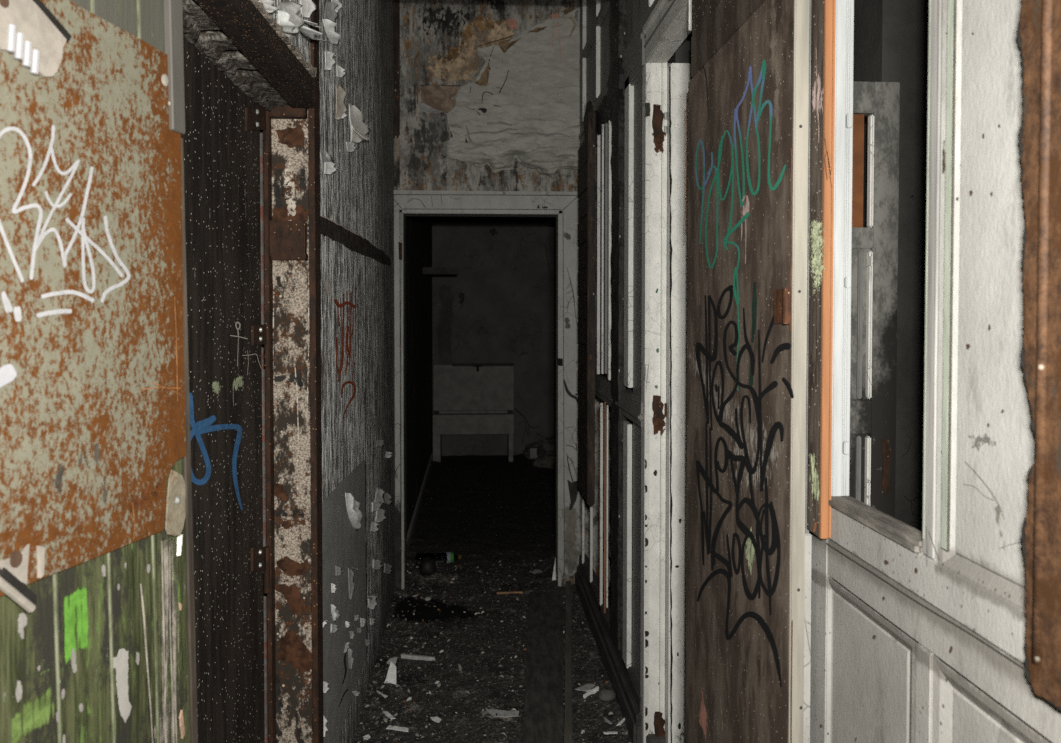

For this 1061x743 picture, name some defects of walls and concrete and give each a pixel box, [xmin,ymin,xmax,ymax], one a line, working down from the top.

peeling [477,26,547,53]
peeling [251,0,371,152]
rust [276,125,306,148]
peeling [320,152,337,174]
rust [652,132,666,153]
rust [272,205,308,221]
rust [652,415,666,435]
peeling [345,488,393,532]
rust [275,557,309,618]
peeling [323,566,378,669]
rust [276,630,312,673]
peeling [377,657,397,698]